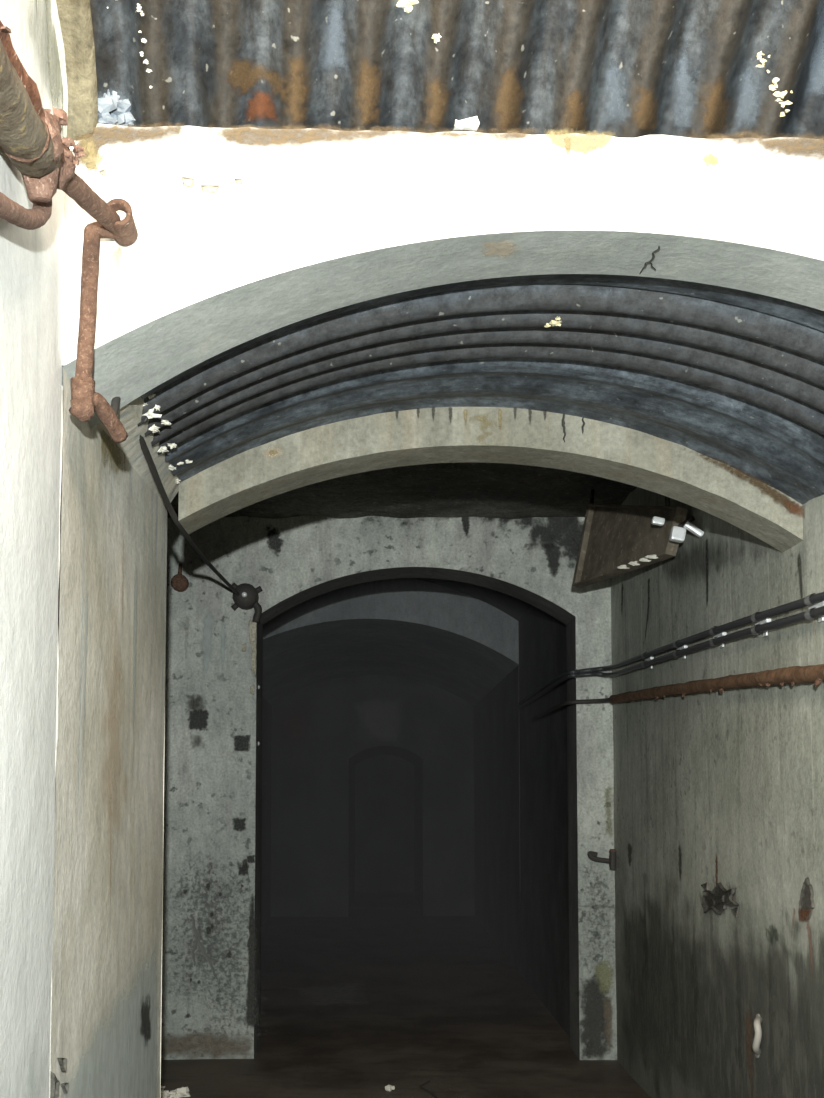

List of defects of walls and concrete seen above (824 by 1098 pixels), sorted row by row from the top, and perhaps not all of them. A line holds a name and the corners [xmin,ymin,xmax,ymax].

corrosion [229,60,307,123]
corrosion [358,59,380,123]
corrosion [427,83,448,126]
corrosion [496,70,524,129]
corrosion [547,91,612,155]
water stain [703,153,719,167]
water stain [705,131,824,160]
crack [639,246,660,274]
water stain [462,517,584,576]
spalling [701,855,740,918]
water stain [181,855,258,1026]
water stain [625,902,824,1098]